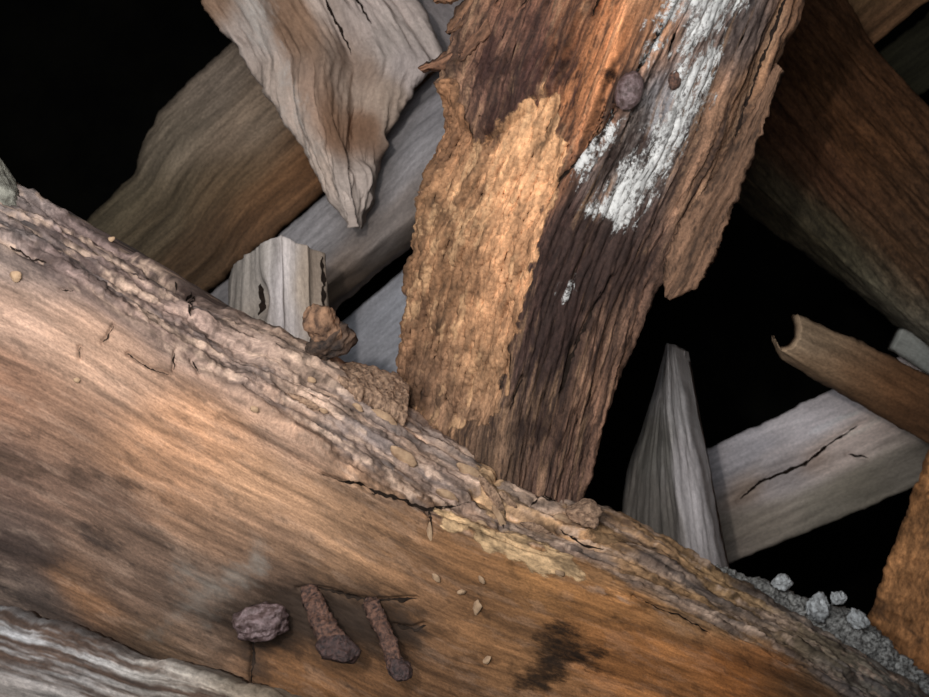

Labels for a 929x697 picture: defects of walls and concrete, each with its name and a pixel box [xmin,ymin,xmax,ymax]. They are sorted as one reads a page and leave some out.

crack [325,0,351,53]
crack [355,0,371,23]
water stain [518,0,749,453]
crack [738,425,868,502]
rust [213,586,314,649]
rust [326,589,380,646]
rust [381,605,425,644]
water stain [516,622,604,691]